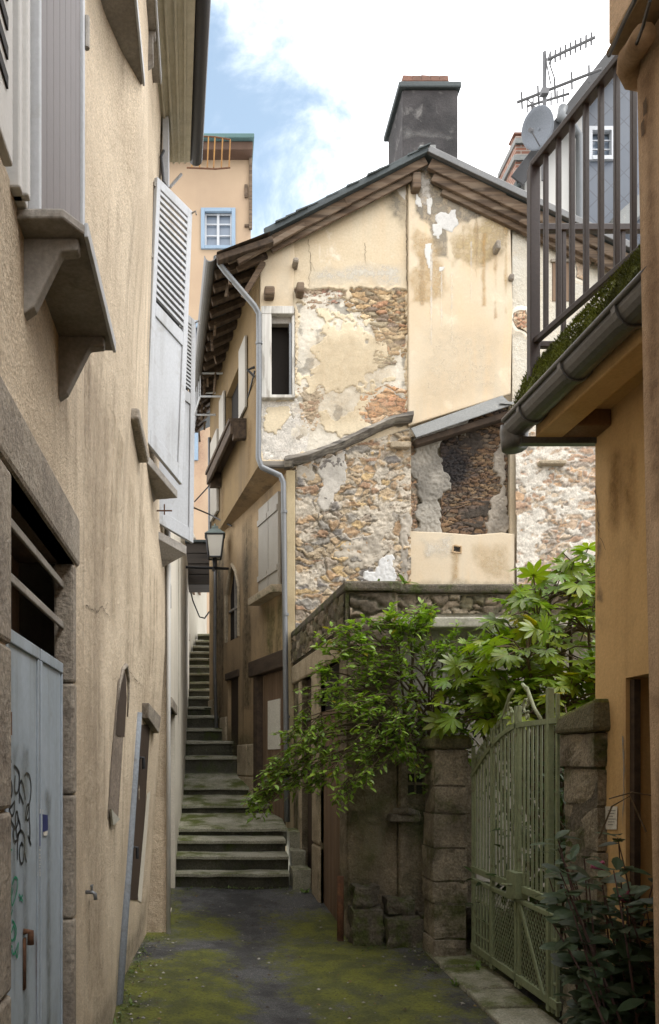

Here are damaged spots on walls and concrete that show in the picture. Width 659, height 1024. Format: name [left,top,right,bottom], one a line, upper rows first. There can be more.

peeling [397,186,459,271]
leakage [392,165,508,313]
spalling [261,284,417,627]
spalling [440,407,595,584]